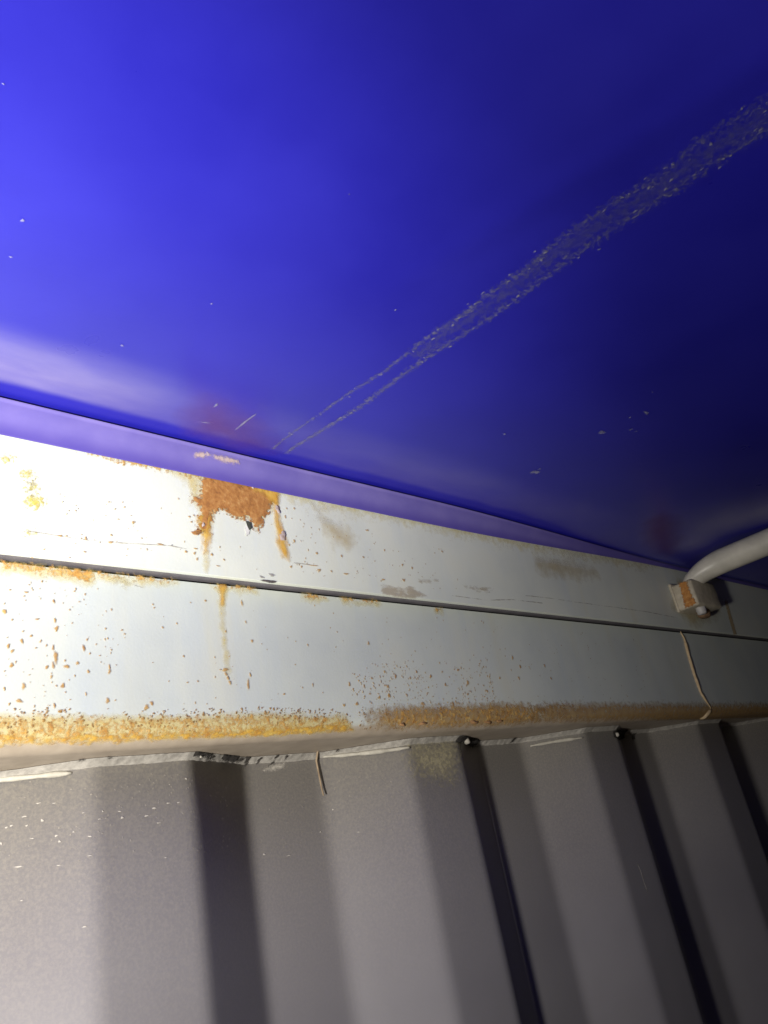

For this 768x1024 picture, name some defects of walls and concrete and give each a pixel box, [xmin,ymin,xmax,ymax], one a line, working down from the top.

corrosion [178,474,357,578]
corrosion [2,557,115,632]
corrosion [0,603,768,748]